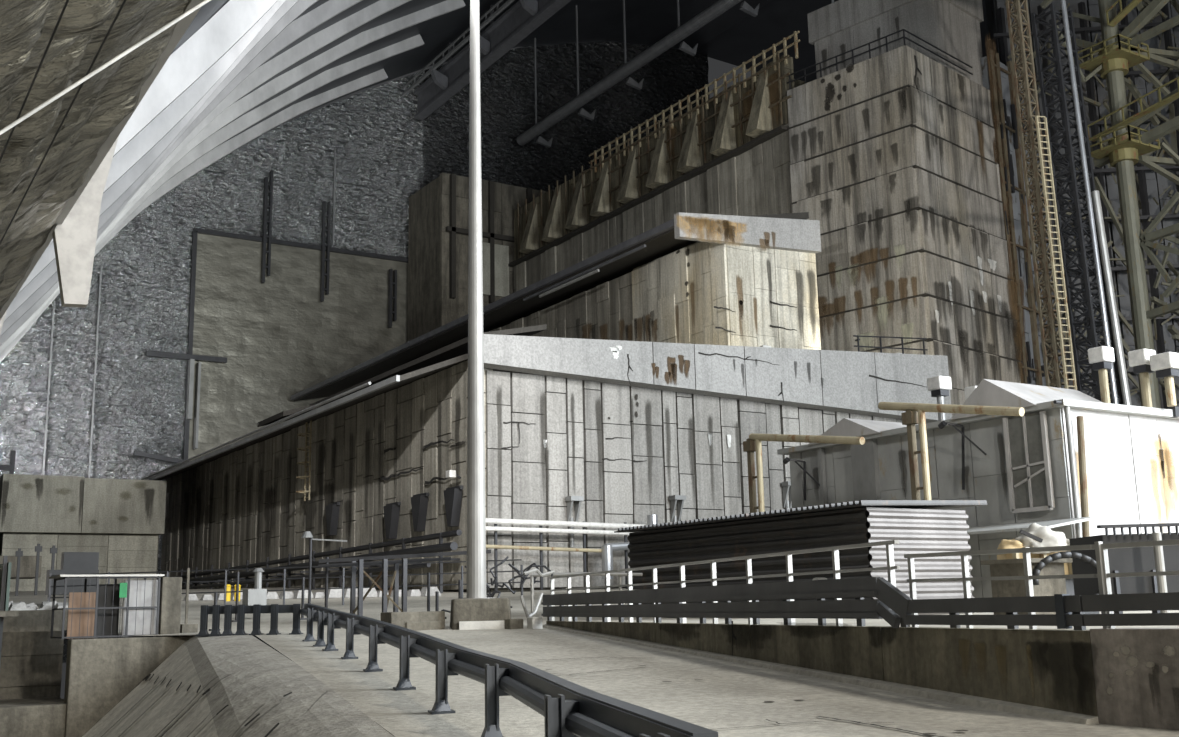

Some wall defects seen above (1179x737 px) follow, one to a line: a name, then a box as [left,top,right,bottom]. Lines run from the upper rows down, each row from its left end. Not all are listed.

water stain [884,76,920,115]
water stain [791,127,823,155]
water stain [807,155,856,211]
water stain [876,143,898,192]
corrosion [680,217,745,241]
corrosion [760,232,775,250]
water stain [796,271,816,332]
corrosion [818,248,917,335]
water stain [875,296,889,323]
water stain [922,207,1020,380]
corrosion [651,355,690,384]
corrosion [1151,434,1178,510]